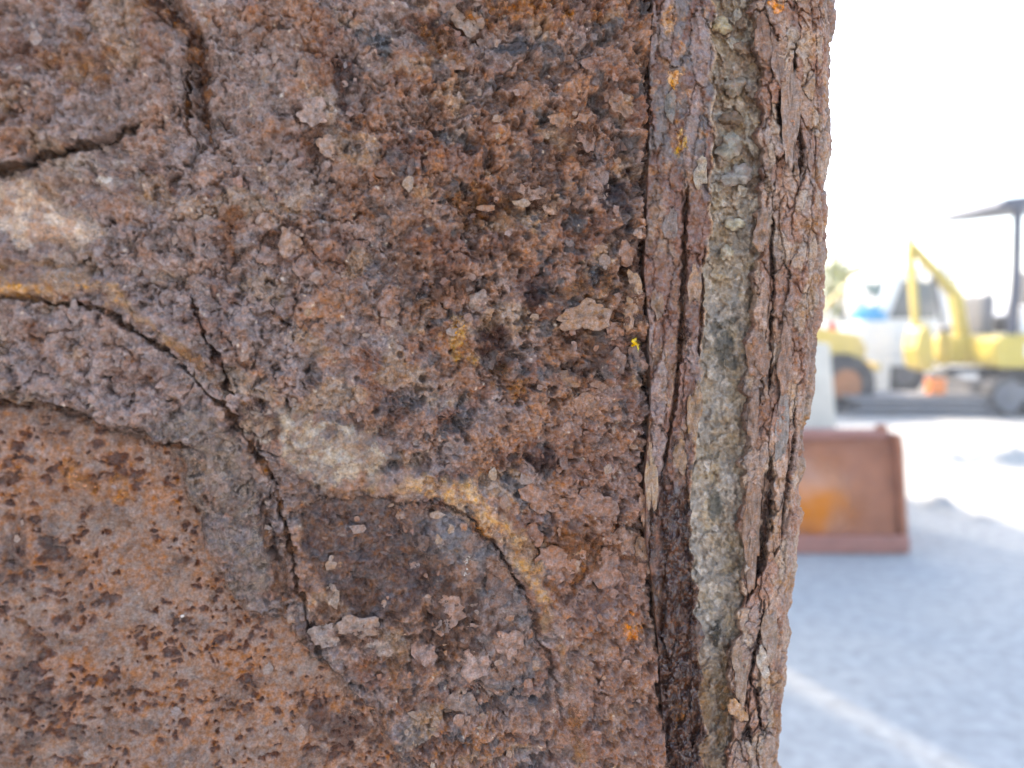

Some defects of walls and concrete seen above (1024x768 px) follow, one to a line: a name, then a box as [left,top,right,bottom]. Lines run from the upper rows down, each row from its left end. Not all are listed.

crack [0,120,145,178]
rust [466,0,575,29]
rust [667,70,682,90]
crack [776,97,805,182]
rust [0,262,248,409]
crack [0,292,302,616]
crack [530,185,705,722]
rust [713,0,837,768]
crack [768,211,783,397]
rust [407,477,552,615]
crack [451,506,552,661]
rust [622,611,645,642]